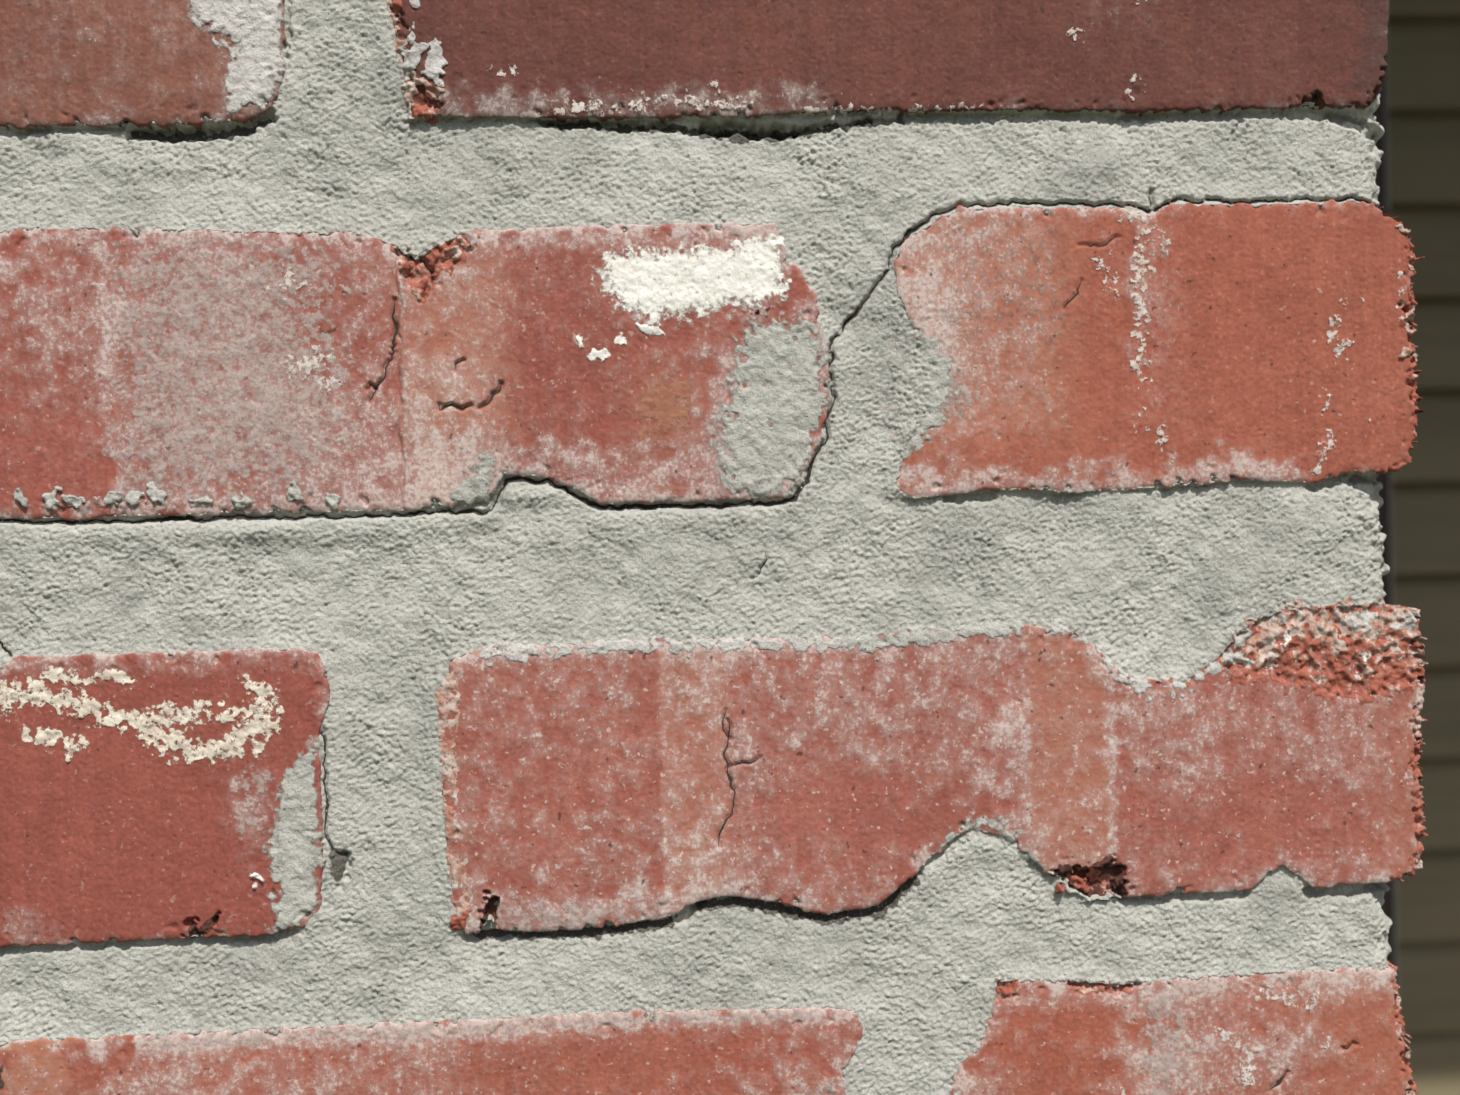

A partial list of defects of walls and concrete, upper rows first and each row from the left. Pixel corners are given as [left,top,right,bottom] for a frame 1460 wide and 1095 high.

spalling [390,233,480,303]
crack [0,193,1376,524]
spalling [1160,586,1427,705]
water stain [0,665,285,765]
crack [718,712,761,846]
spalling [1405,710,1428,877]
spalling [1050,854,1129,901]